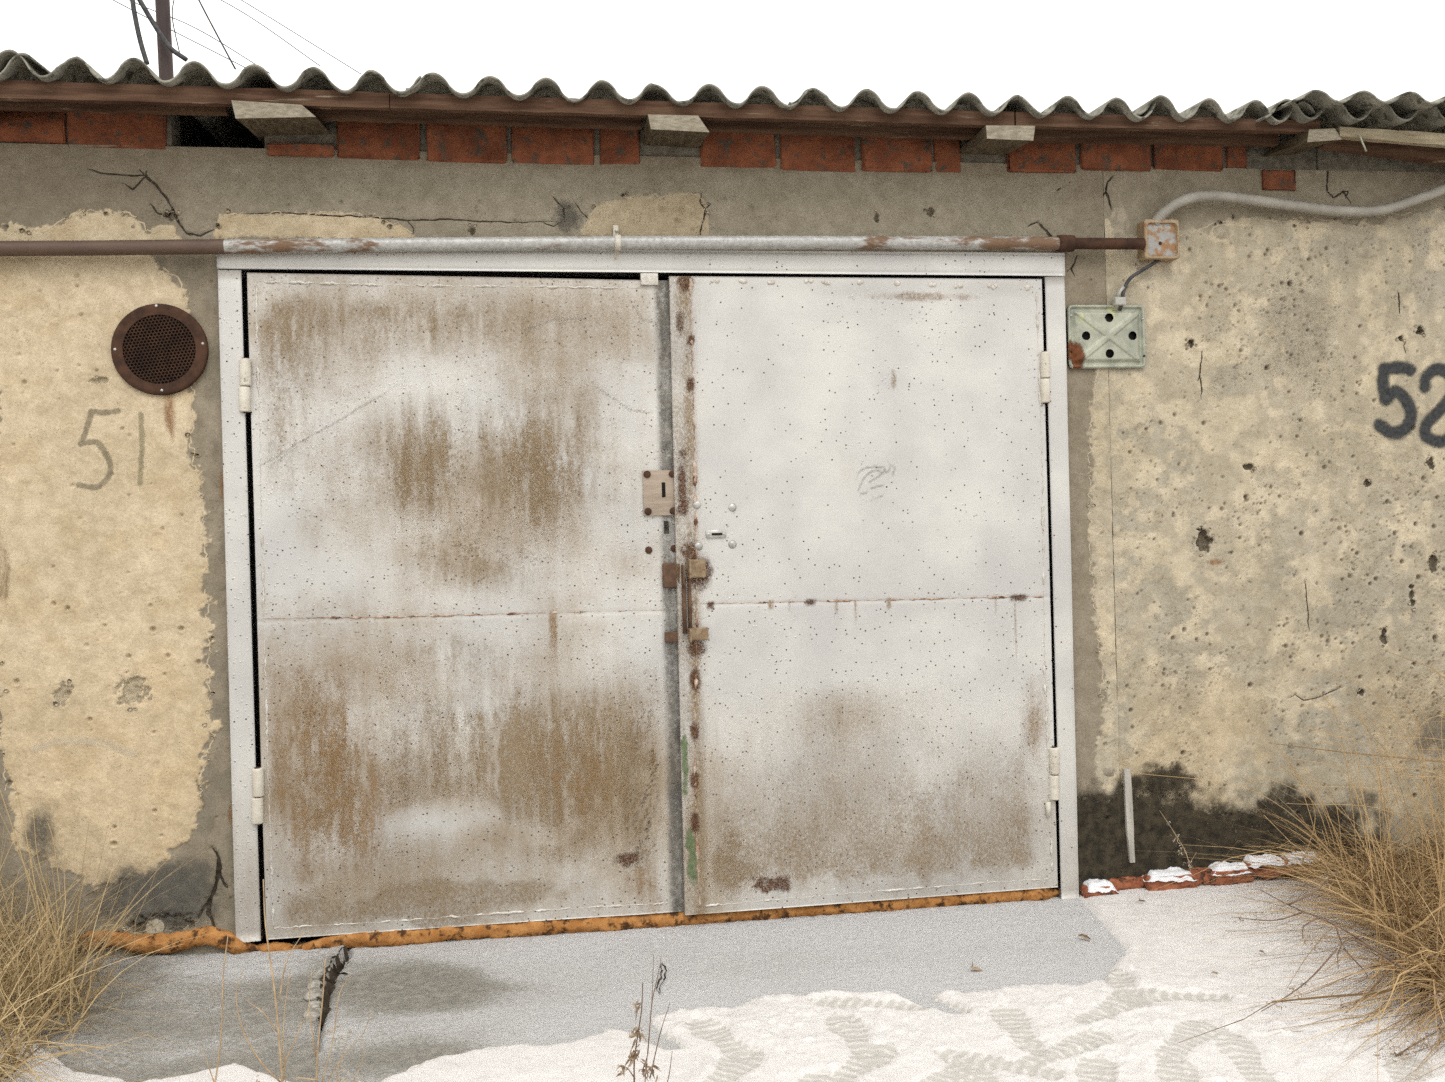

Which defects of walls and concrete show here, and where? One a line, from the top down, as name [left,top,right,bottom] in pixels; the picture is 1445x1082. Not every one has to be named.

rust [0,239,225,256]
rust [1075,238,1146,250]
rust [388,415,465,505]
rust [482,412,583,522]
rust [675,276,1028,915]
rust [274,676,408,874]
rust [431,695,657,892]
flaking render [122,913,195,934]
rust [293,881,540,925]